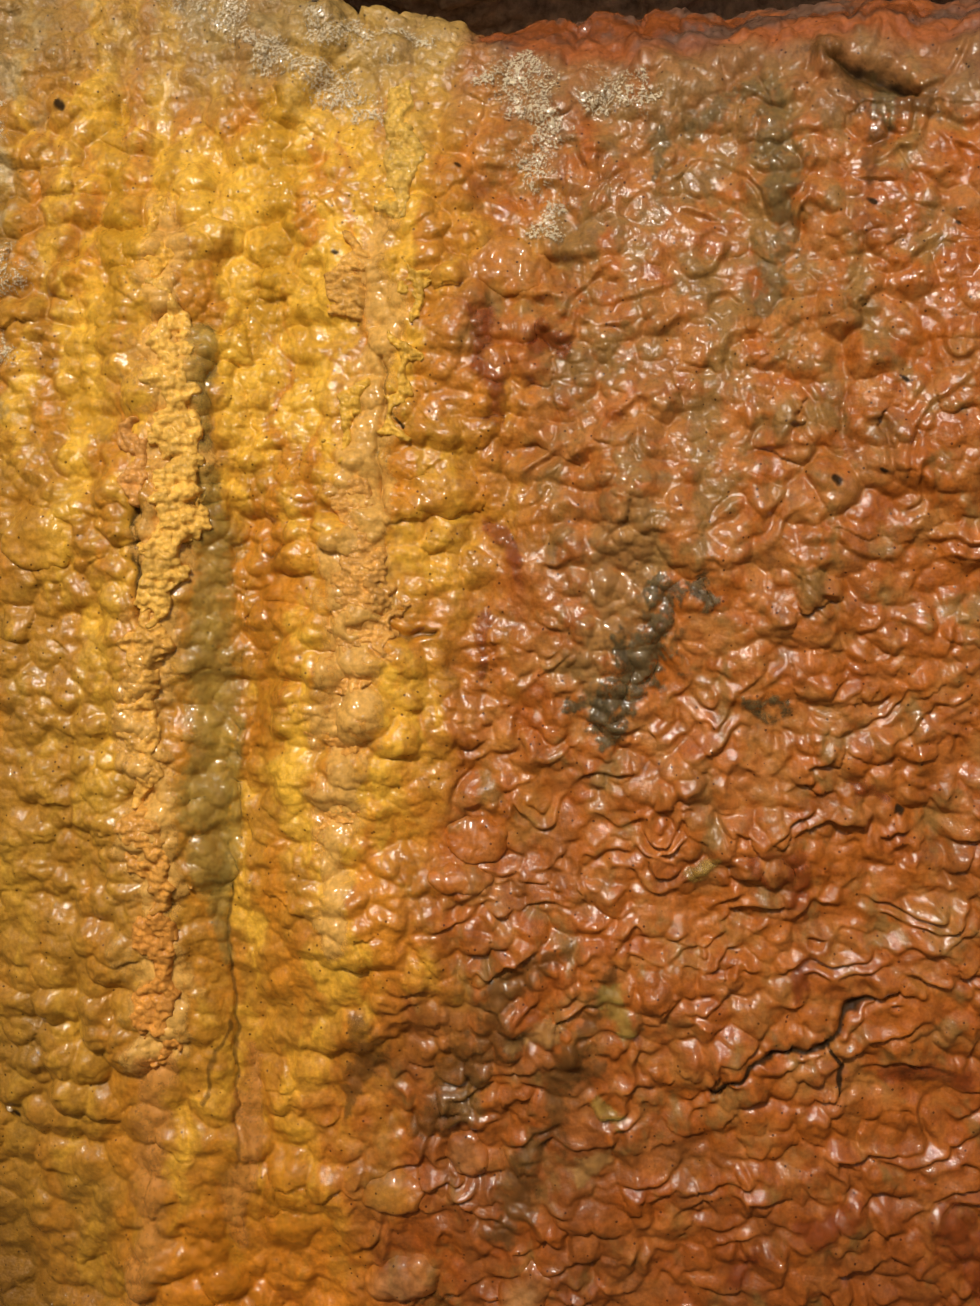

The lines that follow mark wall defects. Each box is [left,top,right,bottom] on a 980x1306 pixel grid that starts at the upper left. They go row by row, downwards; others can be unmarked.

rust [480,11,747,44]
efflorescence [575,64,662,116]
efflorescence [471,49,577,244]
efflorescence [0,240,28,297]
leakage [562,570,720,752]
leakage [742,695,791,724]
crack [710,996,875,1095]